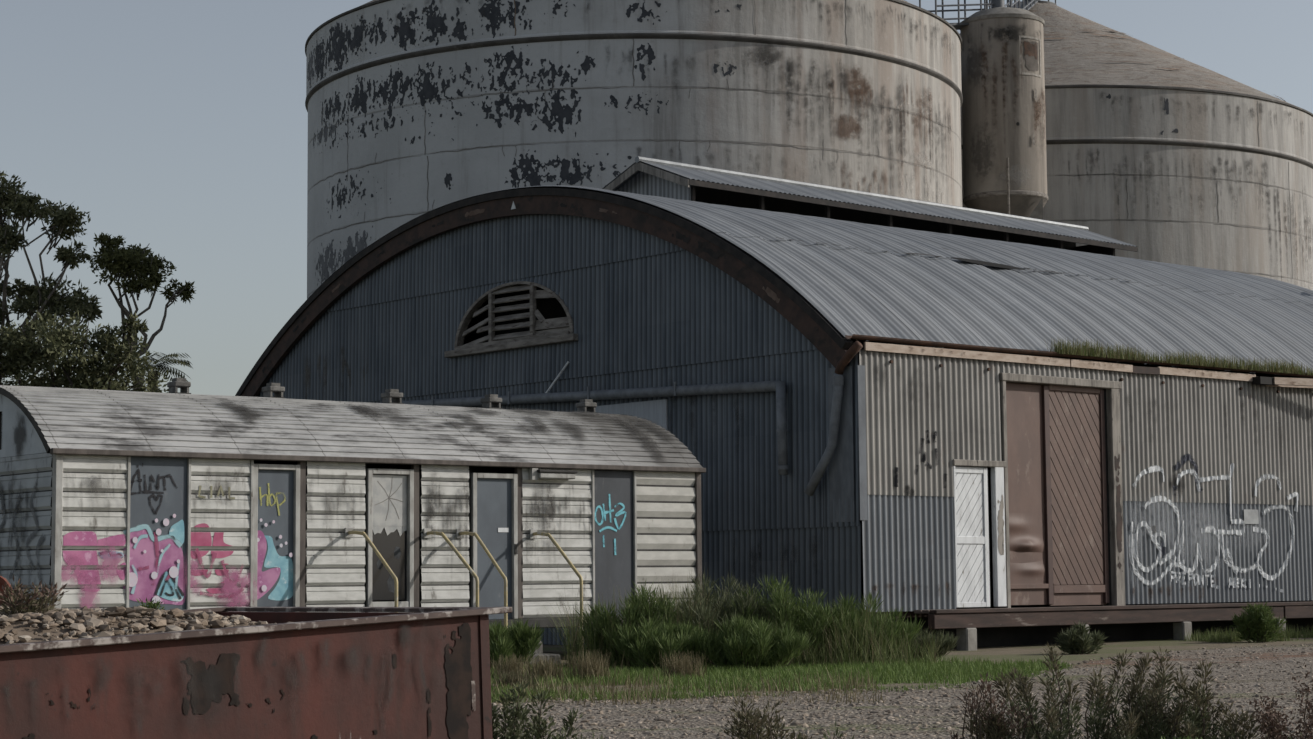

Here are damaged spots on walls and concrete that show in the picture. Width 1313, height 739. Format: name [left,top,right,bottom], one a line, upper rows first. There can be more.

peeling [307,0,632,188]
peeling [315,170,391,293]
water stain [14,417,25,455]